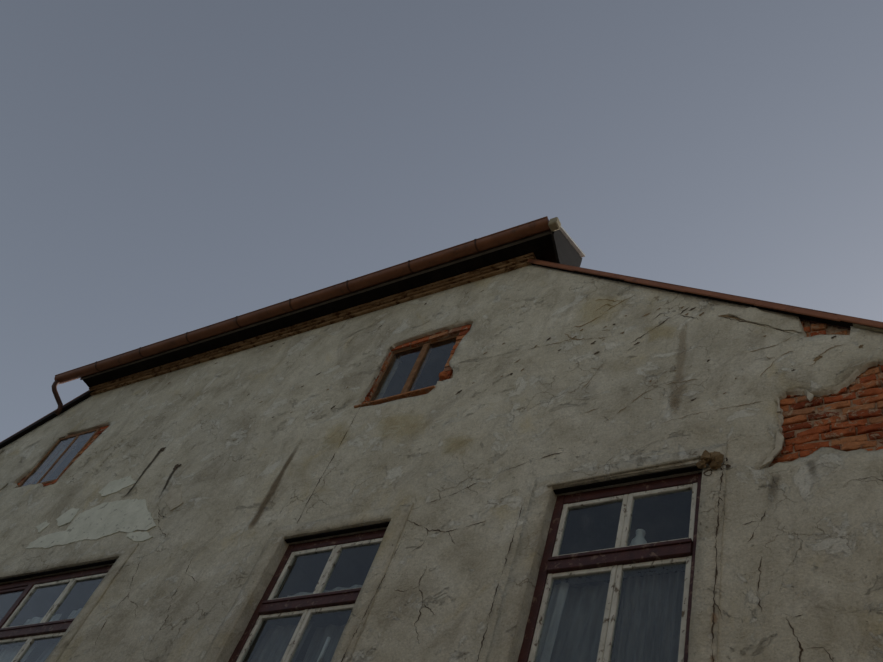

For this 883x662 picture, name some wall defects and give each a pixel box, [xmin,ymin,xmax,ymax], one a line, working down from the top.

flaking render [354,321,473,408]
crack [720,316,794,376]
peeling [719,307,850,339]
flaking render [0,422,110,490]
flaking render [759,359,883,470]
peeling [25,476,156,549]
crack [341,452,566,662]
crack [711,441,728,662]
crack [743,513,765,611]
crack [788,615,833,662]